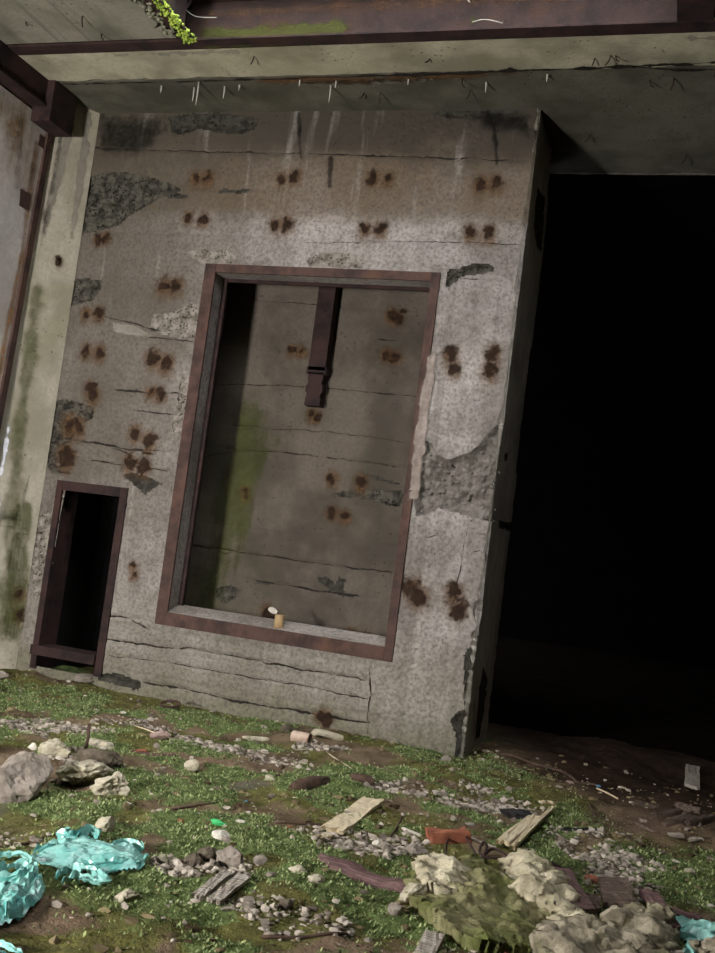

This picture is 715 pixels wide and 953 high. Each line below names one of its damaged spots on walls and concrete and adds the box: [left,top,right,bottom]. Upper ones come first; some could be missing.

spalling [82,172,188,235]
rust [158,275,181,293]
spalling [445,263,494,287]
rust [81,345,105,360]
rust [147,349,173,373]
rust [443,345,461,378]
rust [482,344,500,380]
rust [124,428,158,474]
spalling [330,425,514,536]
rust [401,580,427,607]
rust [447,582,469,621]
spalling [450,635,487,757]